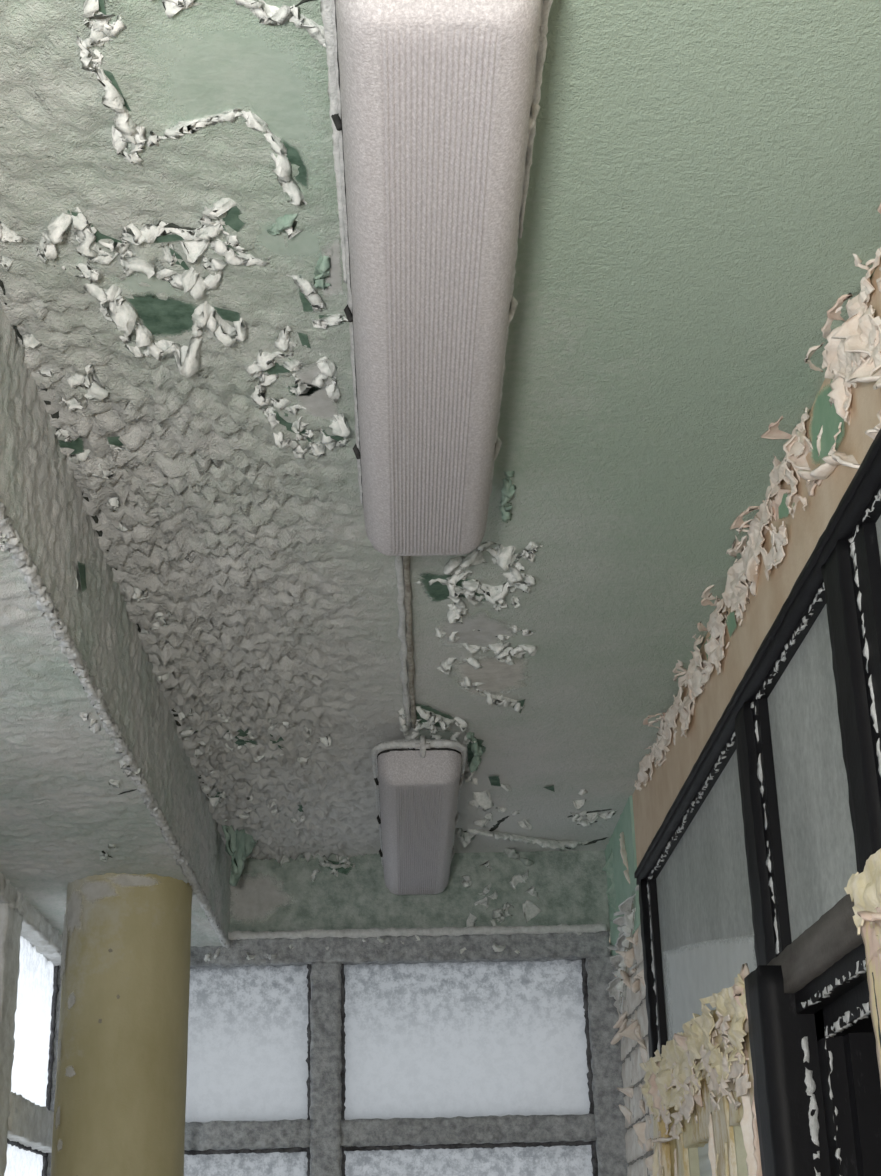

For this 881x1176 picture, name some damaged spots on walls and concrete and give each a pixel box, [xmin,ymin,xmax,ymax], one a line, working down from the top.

peeling [76,0,308,240]
peeling [234,0,327,48]
spalling [107,436,127,452]
peeling [37,198,272,378]
peeling [244,240,350,459]
peeling [634,248,881,791]
peeling [416,541,544,713]
peeling [568,788,617,827]
peeling [602,832,762,1176]
peeling [844,849,881,1047]